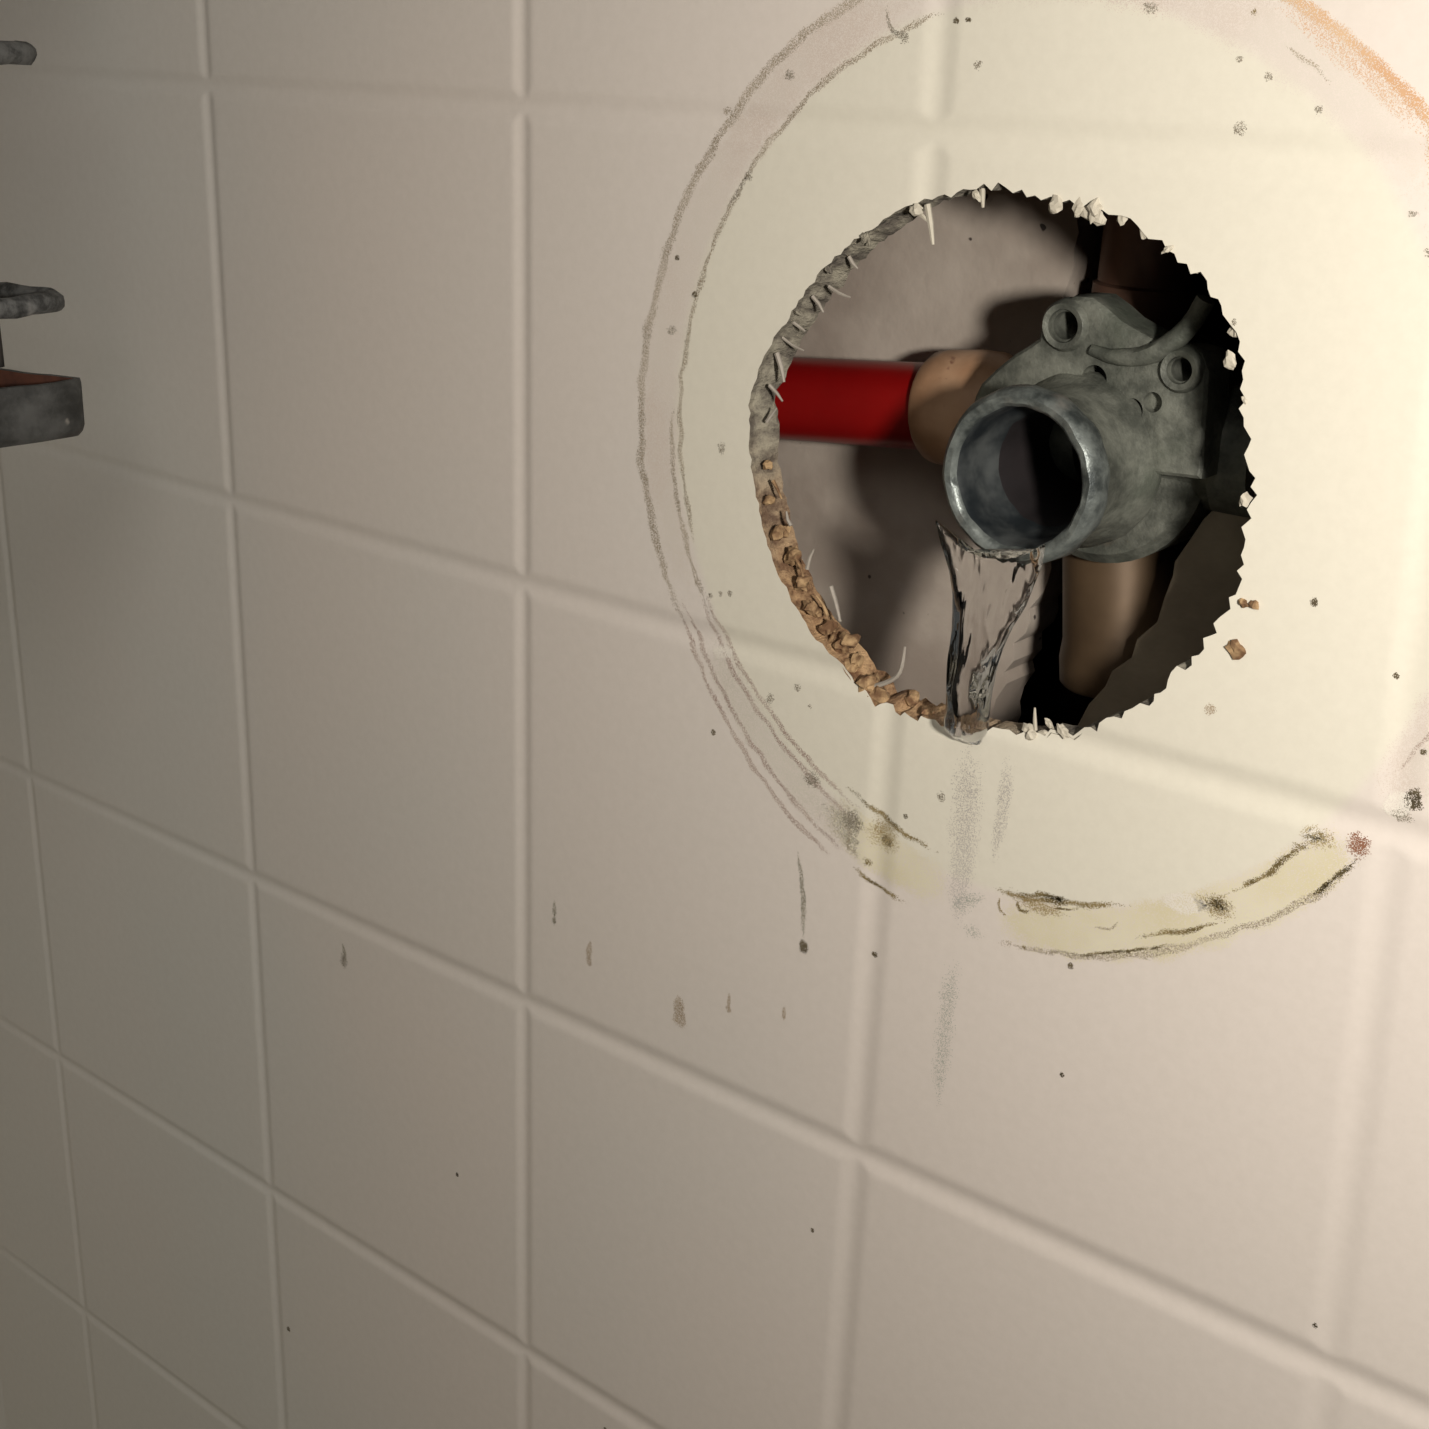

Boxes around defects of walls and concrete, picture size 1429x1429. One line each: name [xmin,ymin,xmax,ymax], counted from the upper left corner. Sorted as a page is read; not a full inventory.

corrosion [1275,0,1429,179]
spalling [1048,194,1147,240]
spalling [1192,272,1245,370]
spalling [753,197,954,716]
spalling [1239,492,1253,507]
spalling [989,592,1094,740]
spalling [1225,639,1246,660]
water stain [838,810,908,867]
water stain [937,746,1014,938]
water stain [1292,824,1334,851]
water stain [1009,892,1065,919]
water stain [1195,892,1236,921]